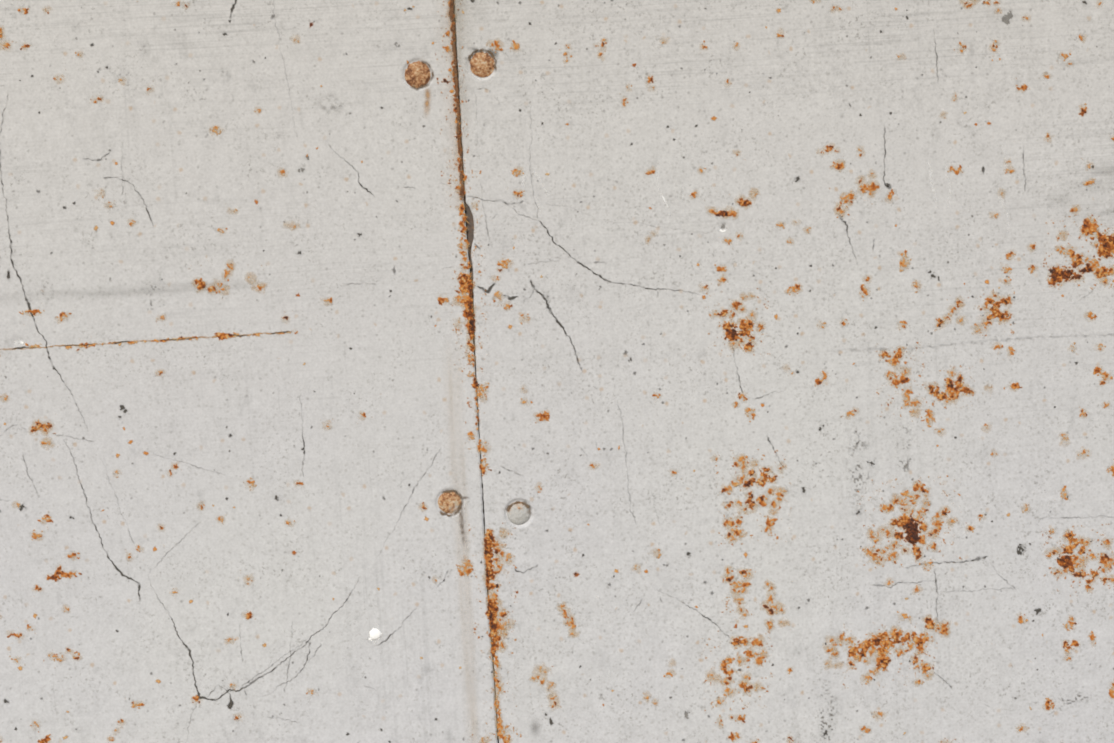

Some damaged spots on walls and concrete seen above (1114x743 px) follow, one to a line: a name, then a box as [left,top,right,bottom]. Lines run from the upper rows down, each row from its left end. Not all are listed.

crack [7,216,63,381]
rust [425,0,530,476]
crack [478,281,578,361]
crack [540,221,679,291]
rust [1028,205,1114,297]
rust [876,342,974,447]
crack [81,485,140,597]
rust [858,480,983,571]
rust [1041,524,1114,597]
crack [173,598,348,709]
rust [705,553,787,743]
rust [825,585,950,685]